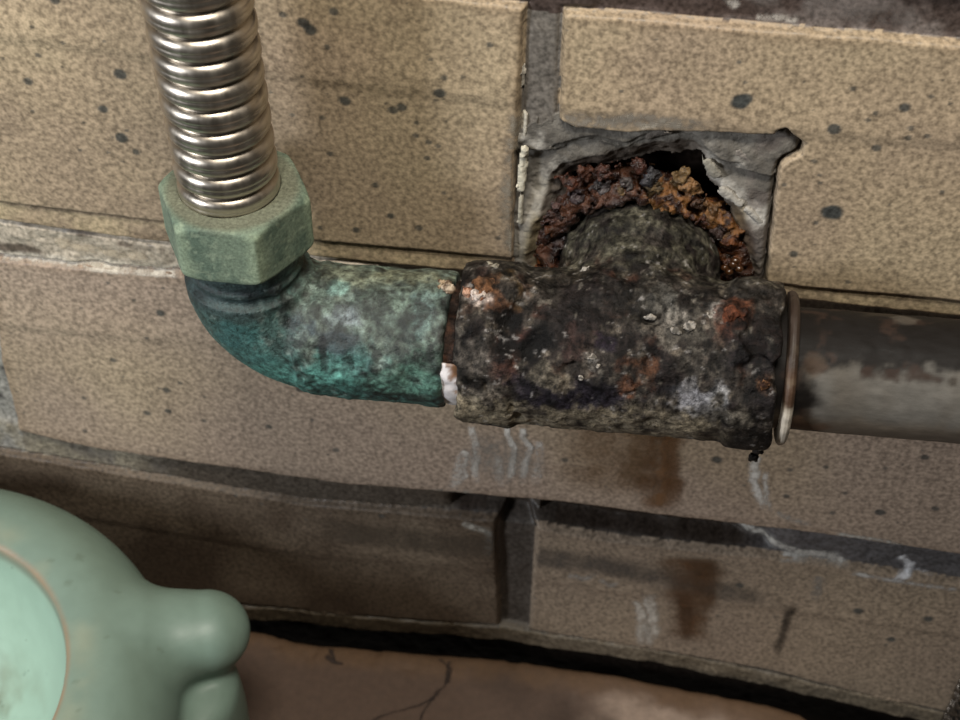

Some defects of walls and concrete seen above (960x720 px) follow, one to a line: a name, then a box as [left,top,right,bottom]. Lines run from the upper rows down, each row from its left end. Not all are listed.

spalling [514,109,800,278]
damp [454,428,542,484]
damp [749,458,768,504]
damp [742,524,845,562]
damp [839,533,955,590]
crack [374,659,451,720]